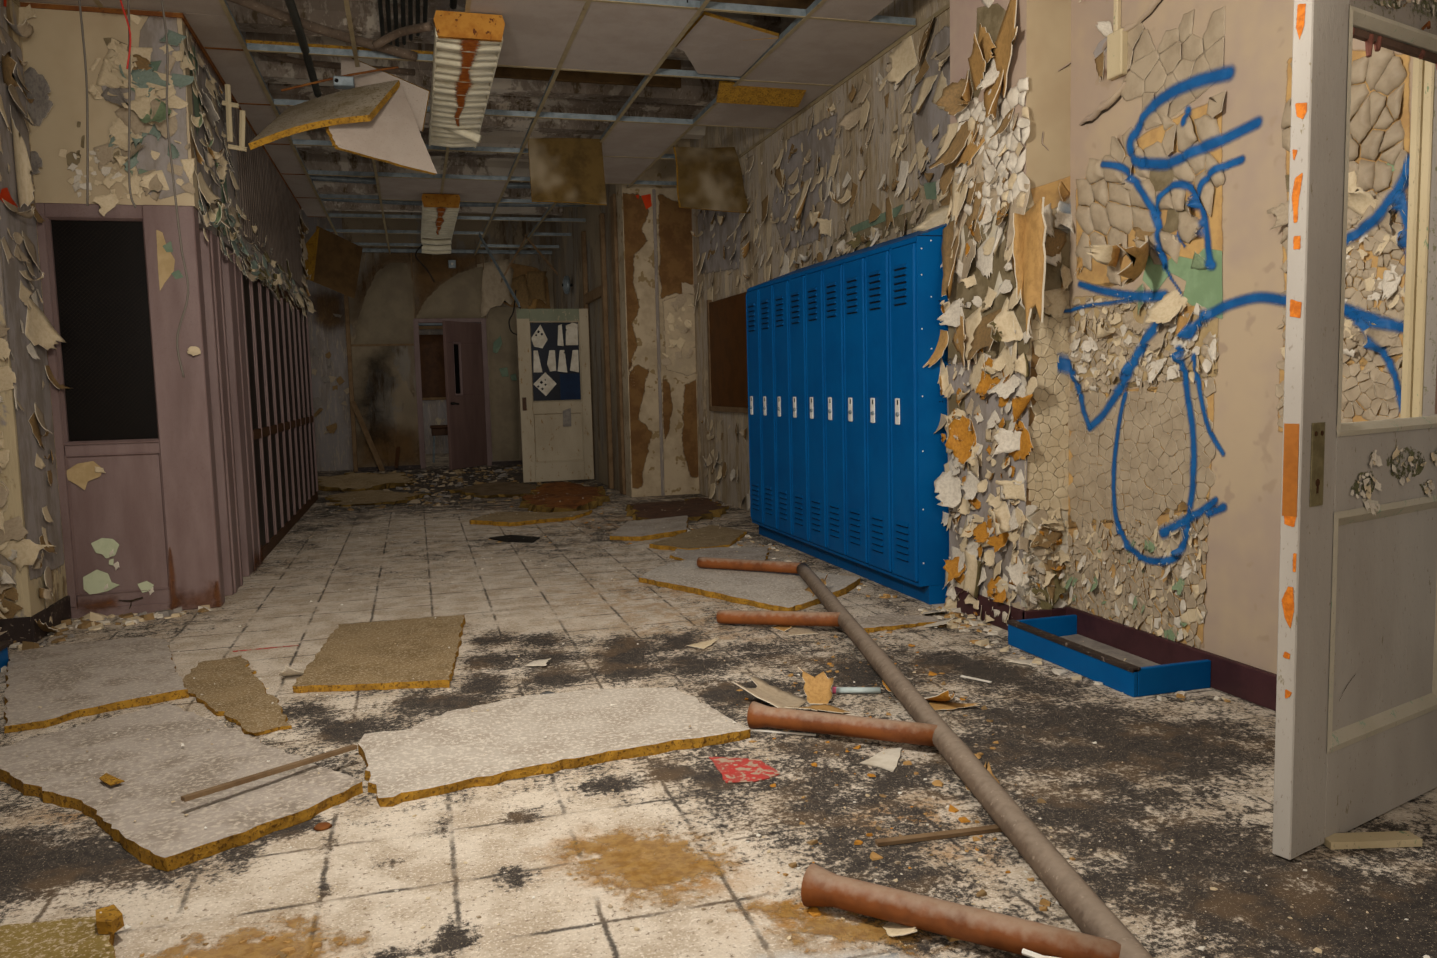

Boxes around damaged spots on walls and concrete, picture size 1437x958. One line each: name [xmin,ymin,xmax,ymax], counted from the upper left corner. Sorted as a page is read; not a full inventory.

spalling [1296,4,1306,40]
crack [954,62,1071,216]
spalling [1295,103,1307,119]
spalling [636,194,652,209]
peeling [1267,149,1303,250]
peeling [1343,161,1405,357]
peeling [0,0,316,646]
peeling [661,0,1223,641]
crack [1025,0,1226,649]
spalling [1276,299,1302,329]
spalling [1284,516,1296,527]
spalling [1282,553,1297,628]